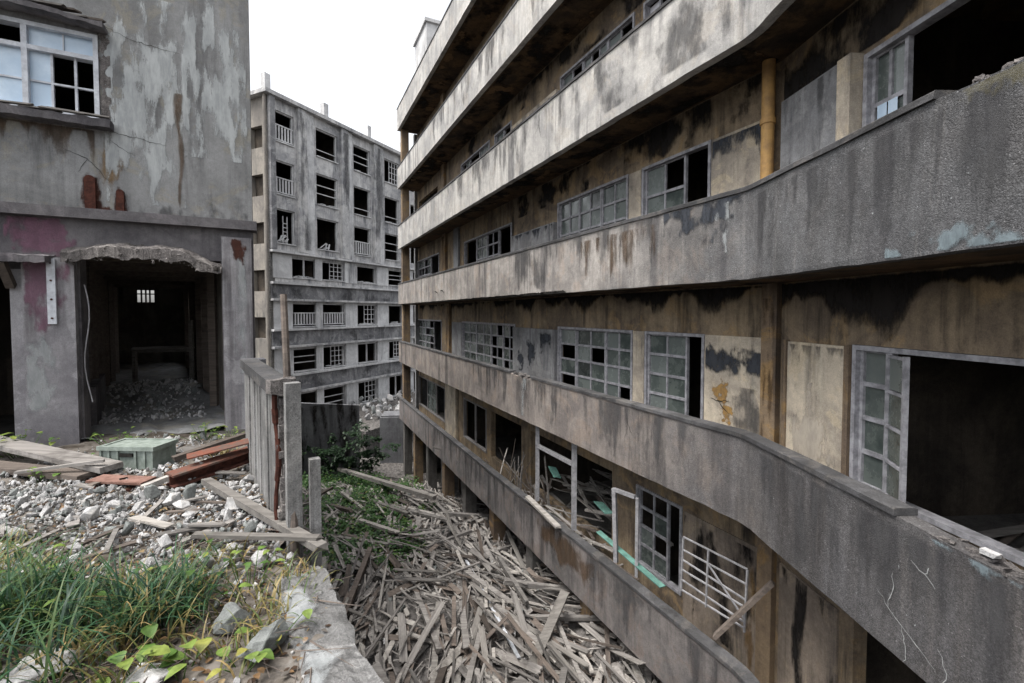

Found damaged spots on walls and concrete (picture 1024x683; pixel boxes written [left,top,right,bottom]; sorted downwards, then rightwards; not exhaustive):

peeling [97,0,247,206]
rust [174,94,184,204]
rust [231,239,246,265]
water stain [420,252,767,313]
water stain [577,220,655,275]
water stain [663,195,739,252]
water stain [782,262,1024,340]
peeling [712,379,733,425]
water stain [791,579,807,683]
crack [877,578,947,683]